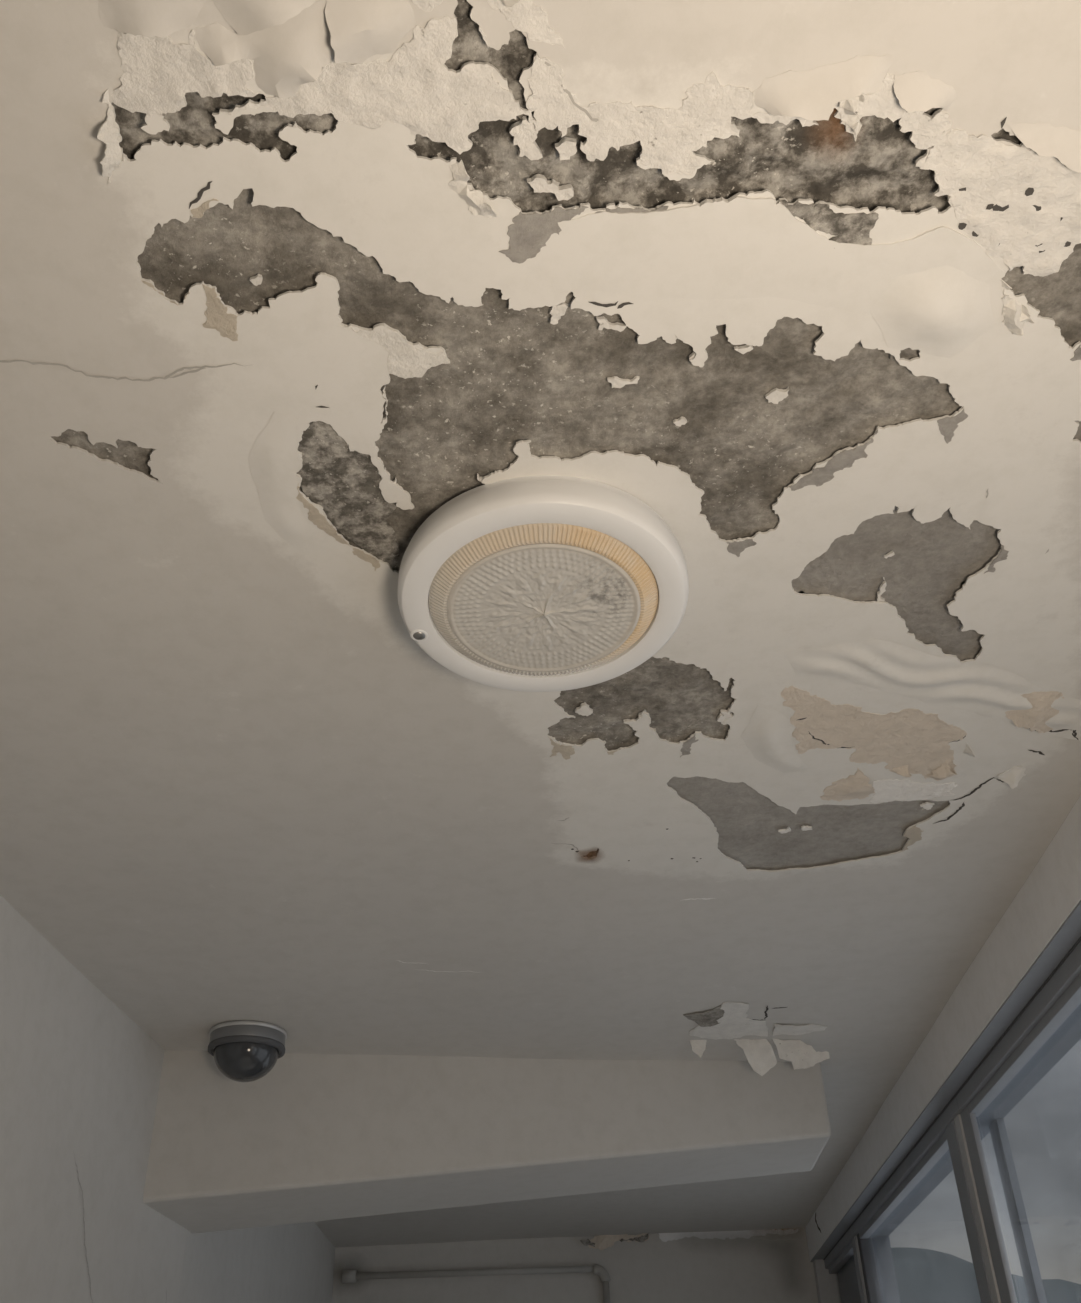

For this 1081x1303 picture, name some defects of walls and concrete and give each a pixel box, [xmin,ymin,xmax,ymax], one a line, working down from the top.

spalling [97,0,1081,571]
crack [0,360,247,381]
spalling [51,429,158,480]
spalling [791,506,1009,661]
spalling [548,657,734,760]
spalling [667,686,976,870]
peeling [683,1002,830,1076]